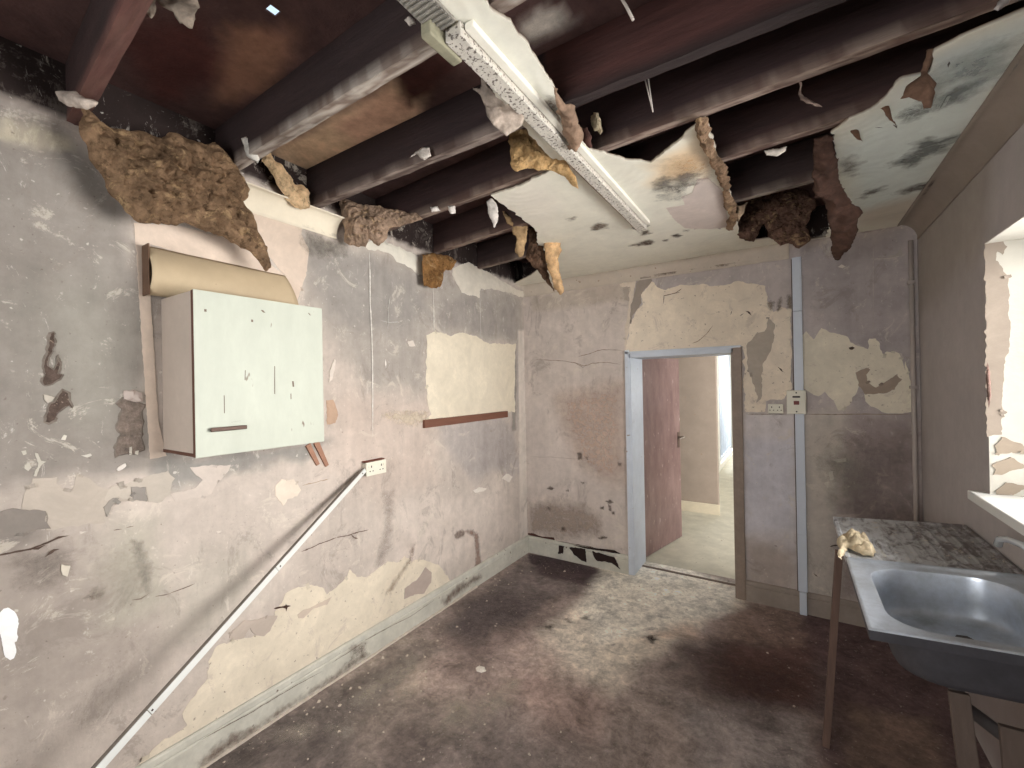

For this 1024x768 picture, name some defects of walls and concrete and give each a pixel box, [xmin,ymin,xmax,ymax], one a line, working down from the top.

leakage [907,56,989,119]
leakage [656,160,695,193]
mould [896,136,958,166]
spalling [366,240,422,275]
spalling [452,262,524,298]
spalling [40,331,74,425]
flaking render [407,330,516,420]
peeling [623,277,911,414]
peeling [983,241,1024,495]
peeling [22,389,231,530]
peeling [558,545,620,569]
peeling [137,556,450,766]